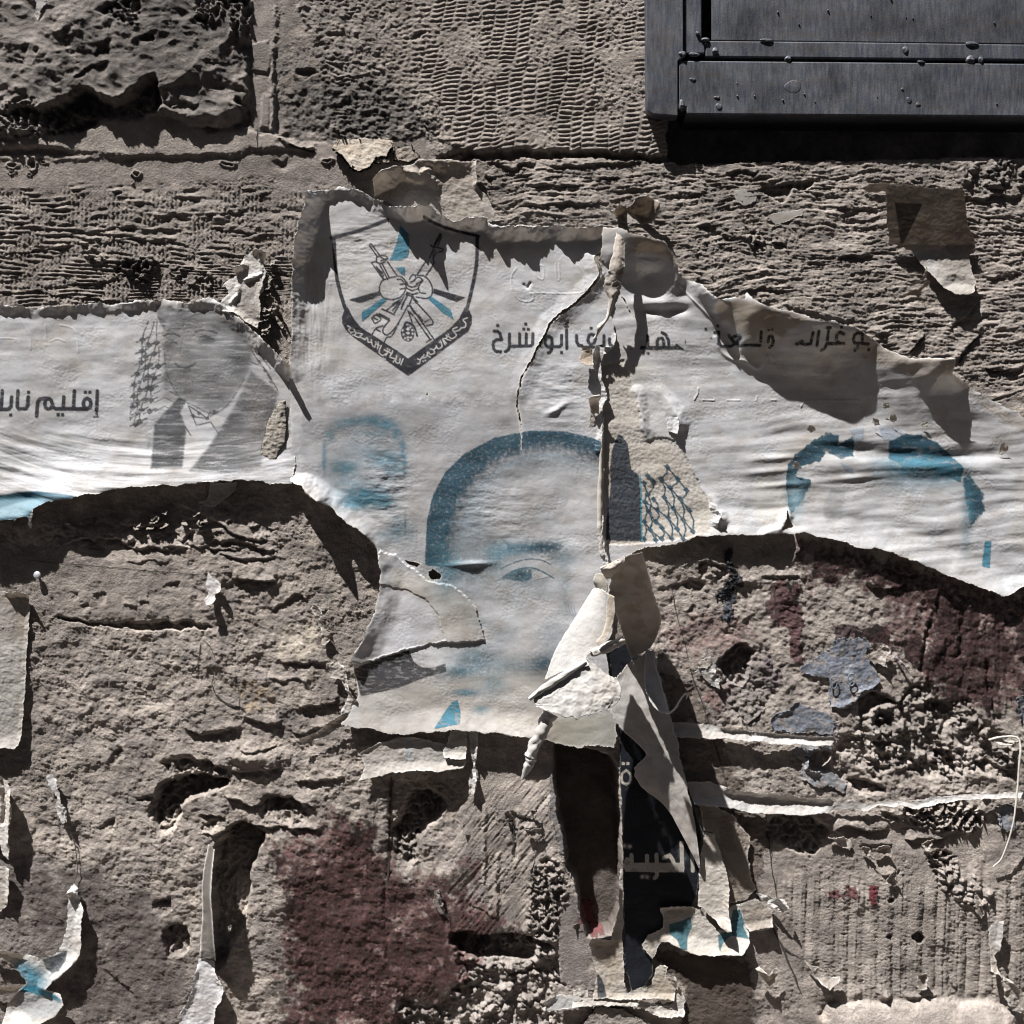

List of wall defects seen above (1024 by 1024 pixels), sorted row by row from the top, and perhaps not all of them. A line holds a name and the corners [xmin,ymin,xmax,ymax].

spalling [113,253,222,290]
peeling [258,261,284,335]
peeling [133,508,208,531]
spalling [694,643,755,689]
spalling [770,637,1018,793]
spalling [148,772,230,837]
spalling [211,821,266,970]
water stain [412,856,480,896]
spalling [390,743,624,1024]
spalling [765,814,891,860]
spalling [922,839,958,884]
spalling [153,897,191,959]